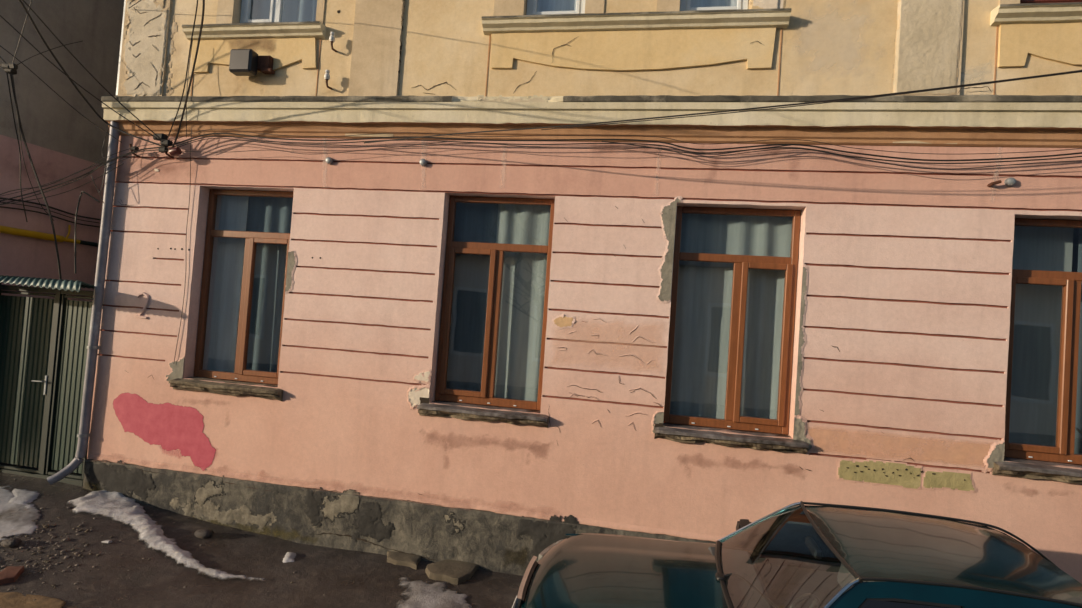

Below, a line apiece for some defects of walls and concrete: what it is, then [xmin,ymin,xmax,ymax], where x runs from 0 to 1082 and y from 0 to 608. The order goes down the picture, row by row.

peeling [750,0,785,9]
peeling [120,0,177,96]
peeling [83,460,163,501]
peeling [170,475,277,534]
peeling [303,487,395,542]